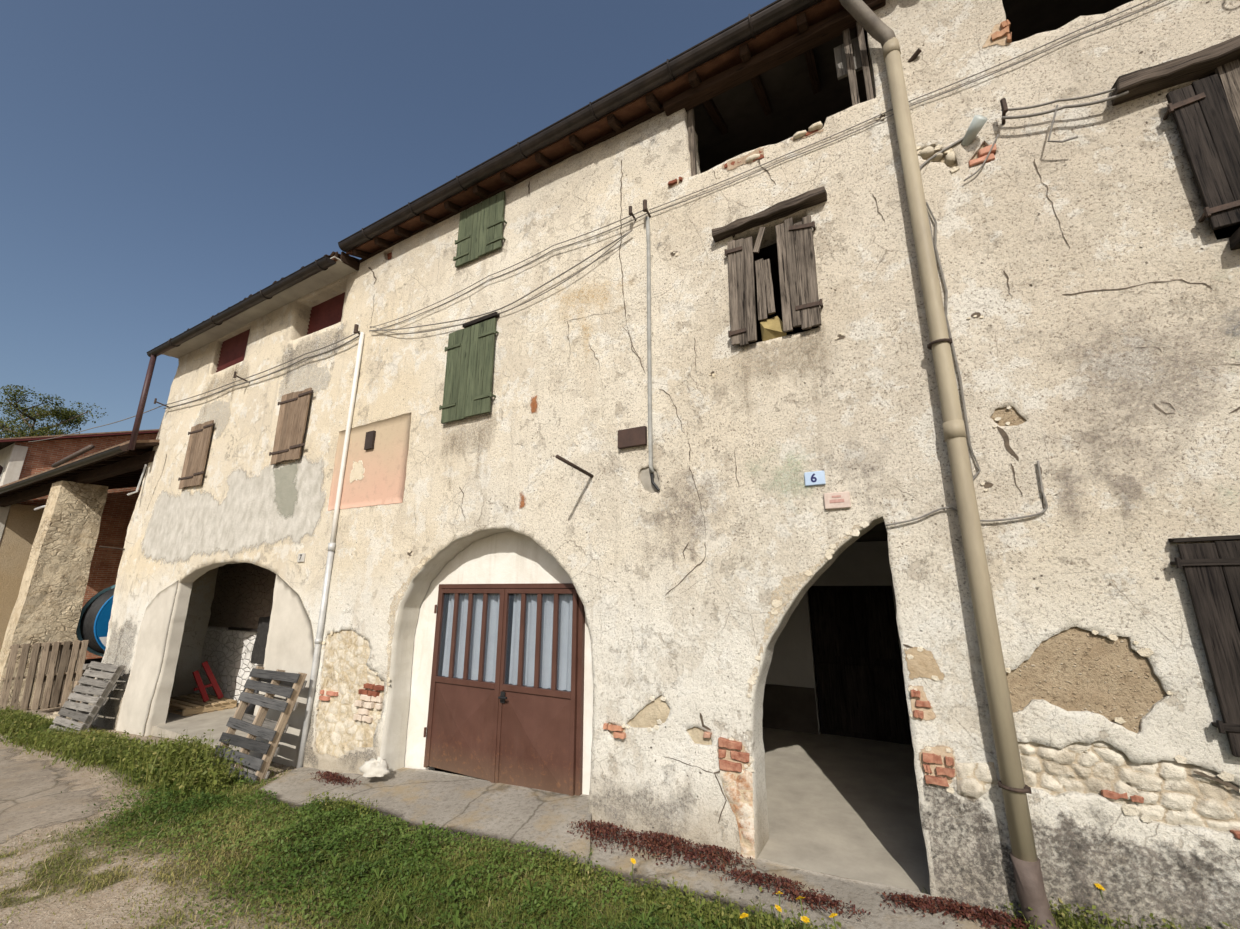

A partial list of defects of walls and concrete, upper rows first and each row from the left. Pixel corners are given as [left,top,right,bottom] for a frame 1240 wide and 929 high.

crack [1062,279,1212,295]
crack [567,160,706,595]
flaking render [990,406,1026,428]
flaking render [316,549,435,758]
peeling [603,695,670,739]
flaking render [904,647,945,721]
flaking render [1005,626,1173,733]
flaking render [687,726,755,859]
flaking render [919,746,999,802]
flaking render [1018,741,1240,840]